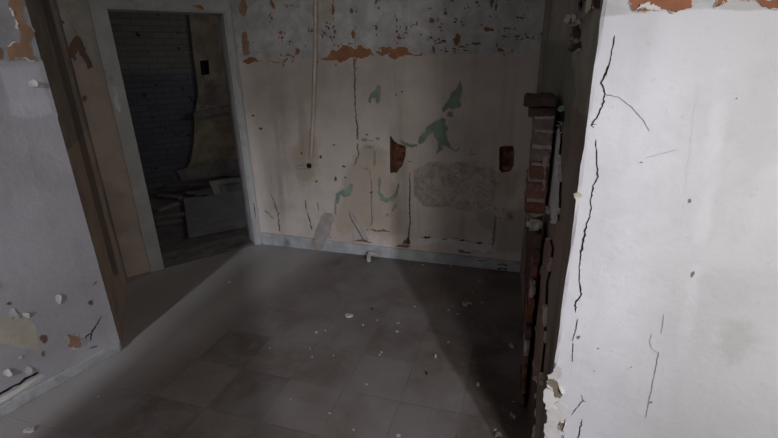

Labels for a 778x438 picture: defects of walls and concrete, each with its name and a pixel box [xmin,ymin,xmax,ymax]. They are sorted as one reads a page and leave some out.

peeling [0,0,37,62]
peeling [69,35,93,69]
peeling [241,0,481,68]
peeling [628,0,692,14]
crack [353,58,373,226]
peeling [390,81,463,173]
spalling [499,146,514,172]
crack [572,36,649,361]
crack [0,372,39,395]
crack [645,314,664,418]